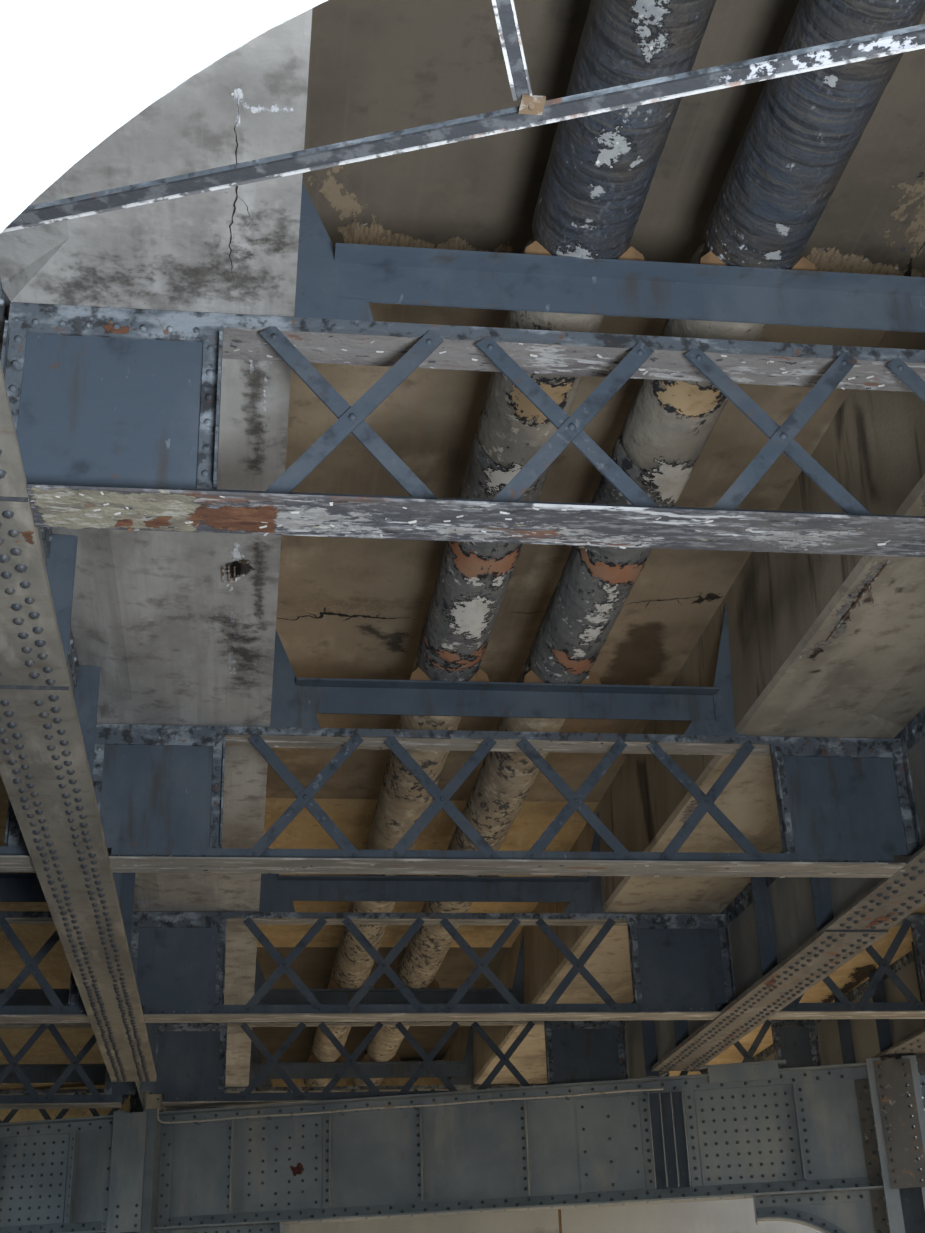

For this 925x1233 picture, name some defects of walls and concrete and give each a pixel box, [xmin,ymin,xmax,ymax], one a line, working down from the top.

peeling [631,0,670,63]
peeling [1,44,925,253]
crack [229,85,250,284]
water stain [63,269,128,303]
mould [170,252,265,299]
crack [904,242,925,277]
water stain [246,360,272,470]
rust [115,501,281,535]
peeling [746,519,855,553]
water stain [212,539,265,674]
crack [278,608,410,621]
peeling [420,521,664,679]